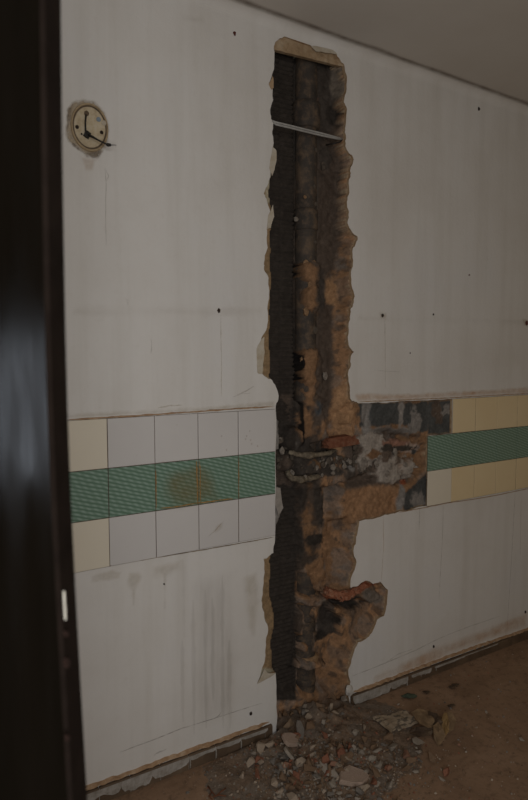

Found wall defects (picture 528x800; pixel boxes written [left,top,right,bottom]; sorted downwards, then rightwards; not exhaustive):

flaking render [86,37,528,800]